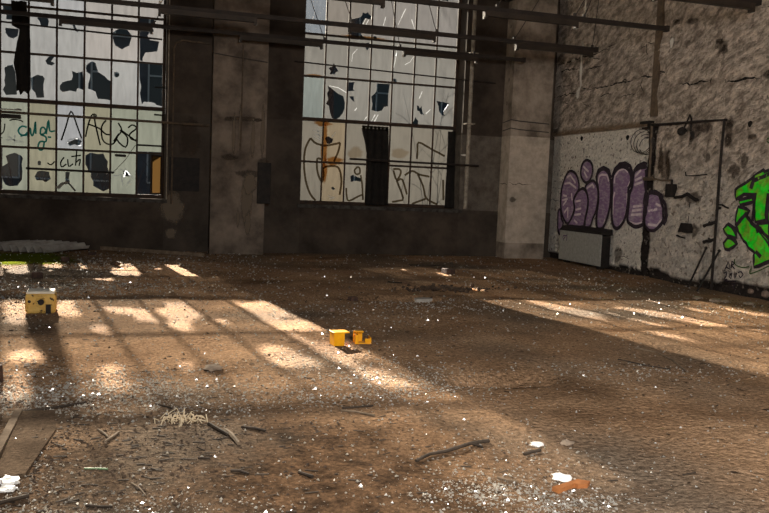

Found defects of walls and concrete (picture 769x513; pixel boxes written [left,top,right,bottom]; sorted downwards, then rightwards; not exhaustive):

crack [557,44,760,107]